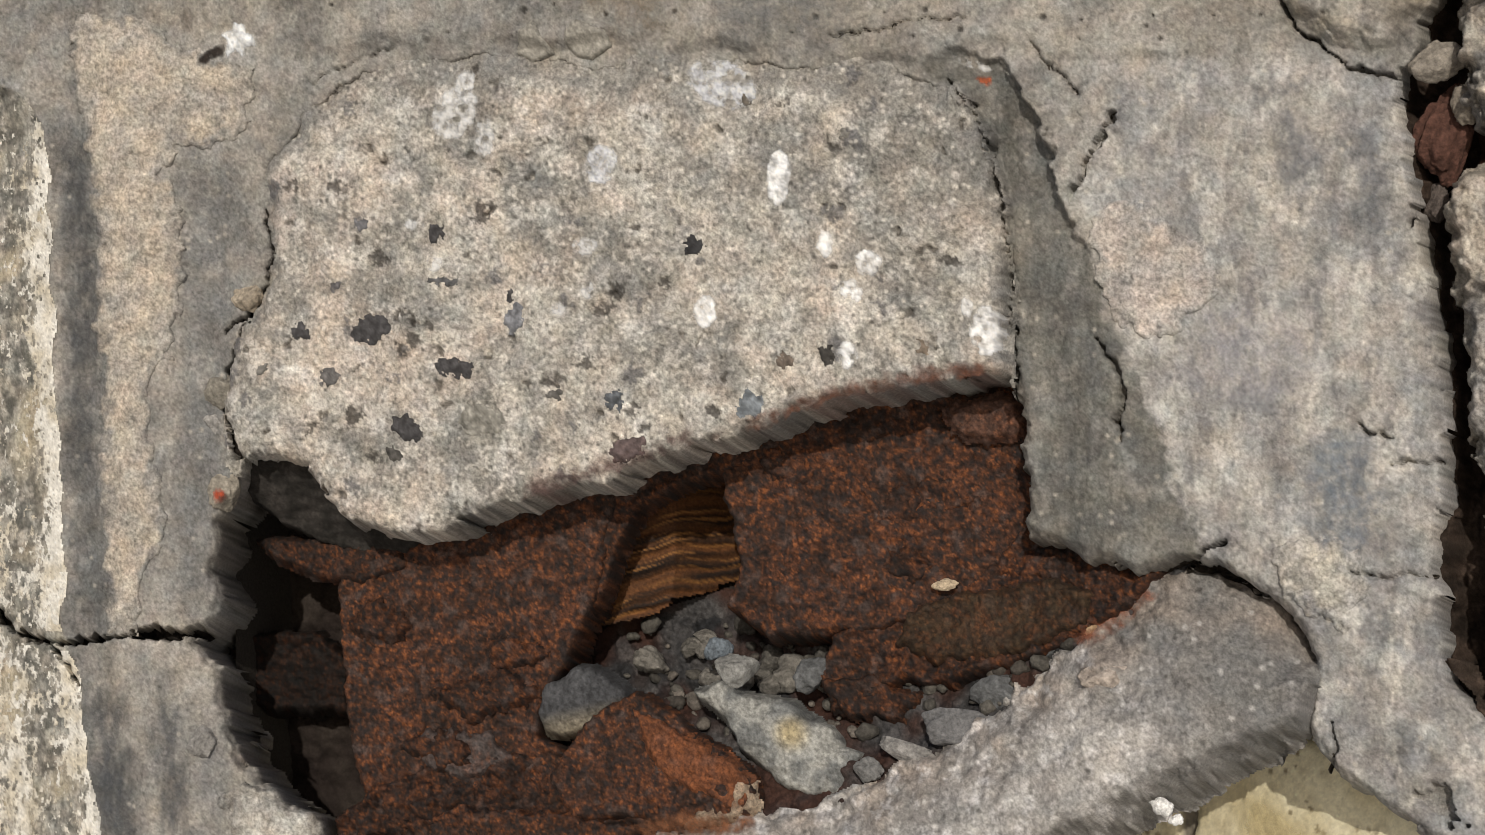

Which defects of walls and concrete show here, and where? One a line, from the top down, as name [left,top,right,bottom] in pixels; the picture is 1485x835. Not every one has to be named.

crack [1361,0,1485,717]
crack [0,608,215,663]
peeling [348,595,413,647]
peeling [820,674,924,725]
peeling [420,674,518,781]
rust [633,709,760,835]
spalling [217,781,338,835]
peeling [400,804,653,835]
peeling [1168,813,1184,826]
spalling [1416,783,1471,831]